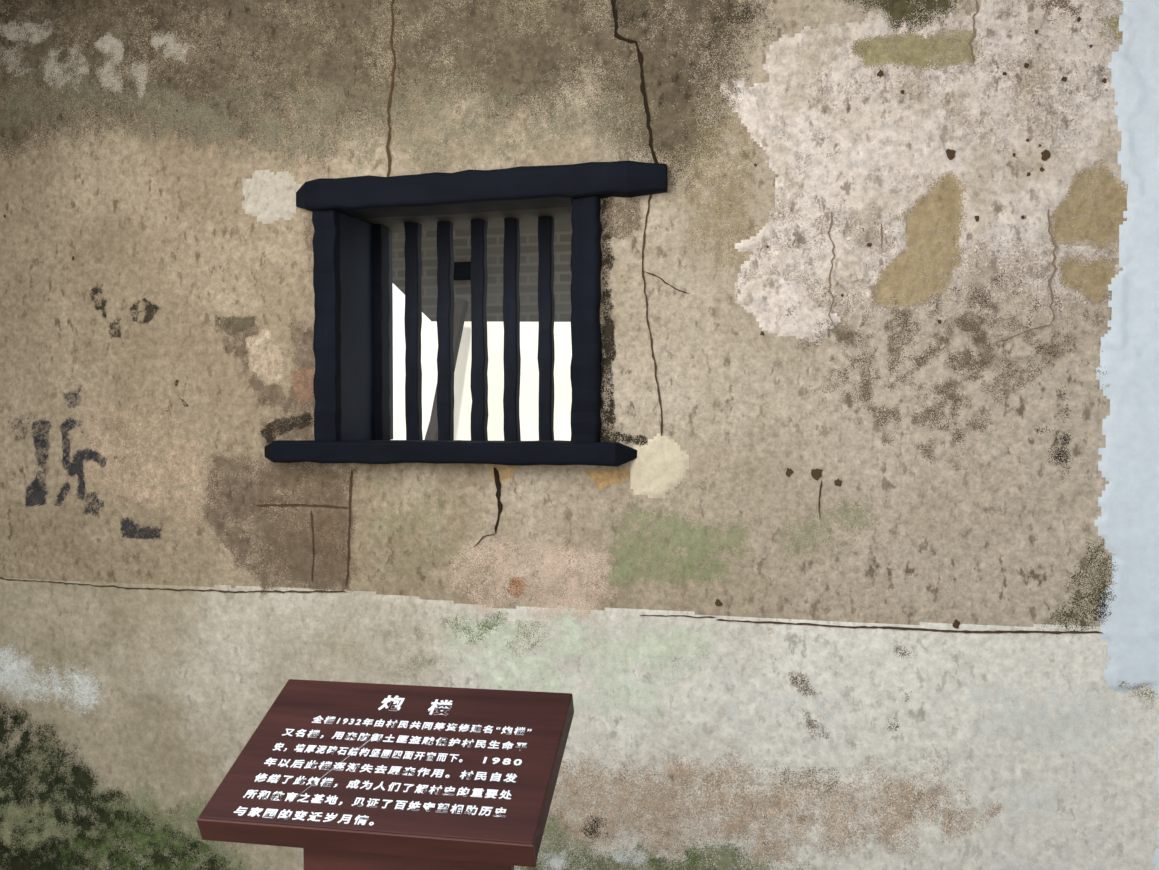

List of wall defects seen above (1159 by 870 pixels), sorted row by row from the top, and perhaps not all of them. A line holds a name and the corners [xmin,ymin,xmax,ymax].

flaking render [0,18,148,99]
flaking render [146,28,195,66]
crack [386,0,396,177]
water stain [0,0,783,273]
crack [611,0,659,163]
water stain [834,0,970,35]
flaking render [720,0,1128,363]
crack [642,194,689,436]
crack [475,464,519,546]
water stain [0,640,107,723]
water stain [385,605,1156,870]